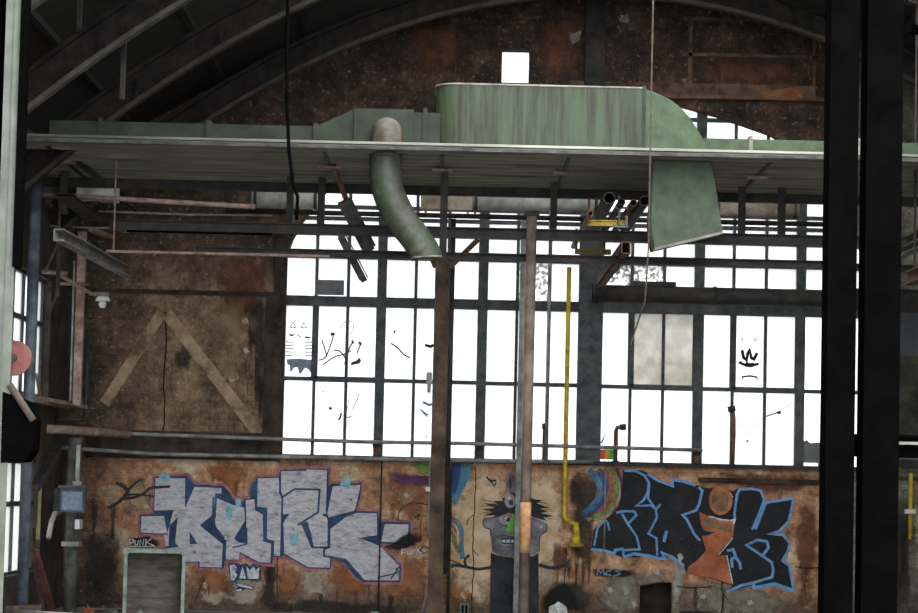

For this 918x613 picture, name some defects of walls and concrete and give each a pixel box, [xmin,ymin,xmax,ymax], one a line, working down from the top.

leakage [84,505,119,594]
peeling [202,580,262,605]
peeling [602,553,786,613]